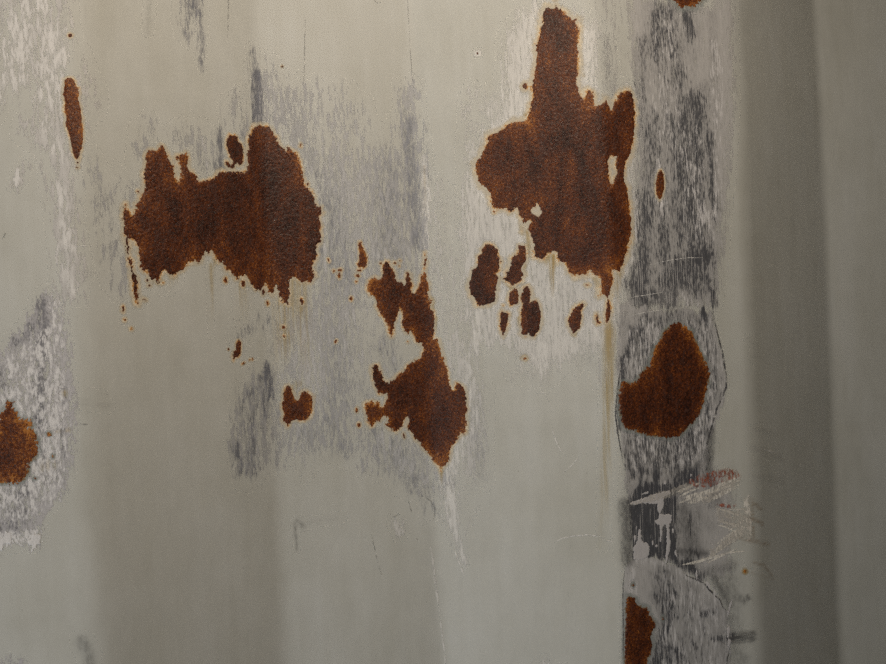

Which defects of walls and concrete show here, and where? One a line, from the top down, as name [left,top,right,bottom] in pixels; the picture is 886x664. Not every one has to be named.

corrosion [672,0,702,10]
corrosion [61,76,85,169]
peeling [173,50,319,179]
corrosion [465,0,640,354]
corrosion [0,400,53,486]
peeling [0,0,141,553]
peeling [227,360,279,477]
corrosion [119,122,469,476]
peeling [420,0,737,664]
corrosion [606,321,711,441]
corrosion [622,582,664,664]